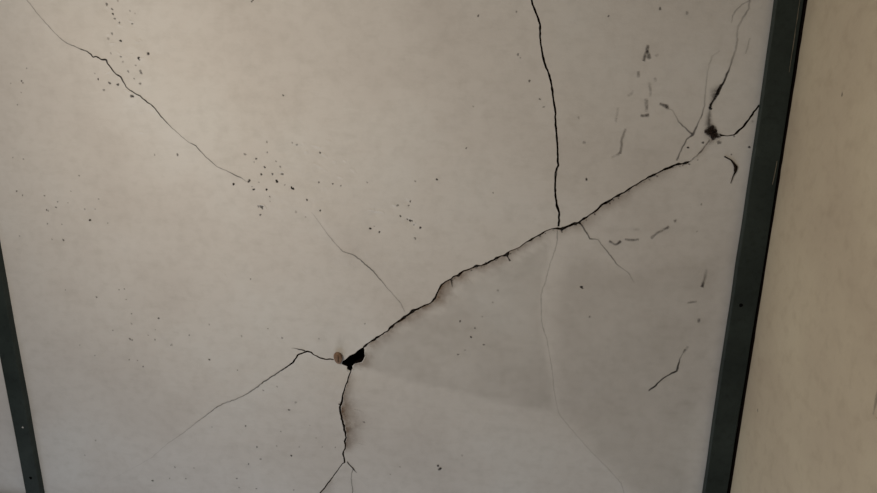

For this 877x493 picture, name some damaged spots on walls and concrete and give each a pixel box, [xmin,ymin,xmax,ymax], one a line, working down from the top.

crack [79,48,169,125]
crack [709,70,729,110]
crack [720,106,759,136]
crack [364,0,697,347]
crack [727,0,807,493]
crack [649,361,680,391]
crack [245,348,356,493]